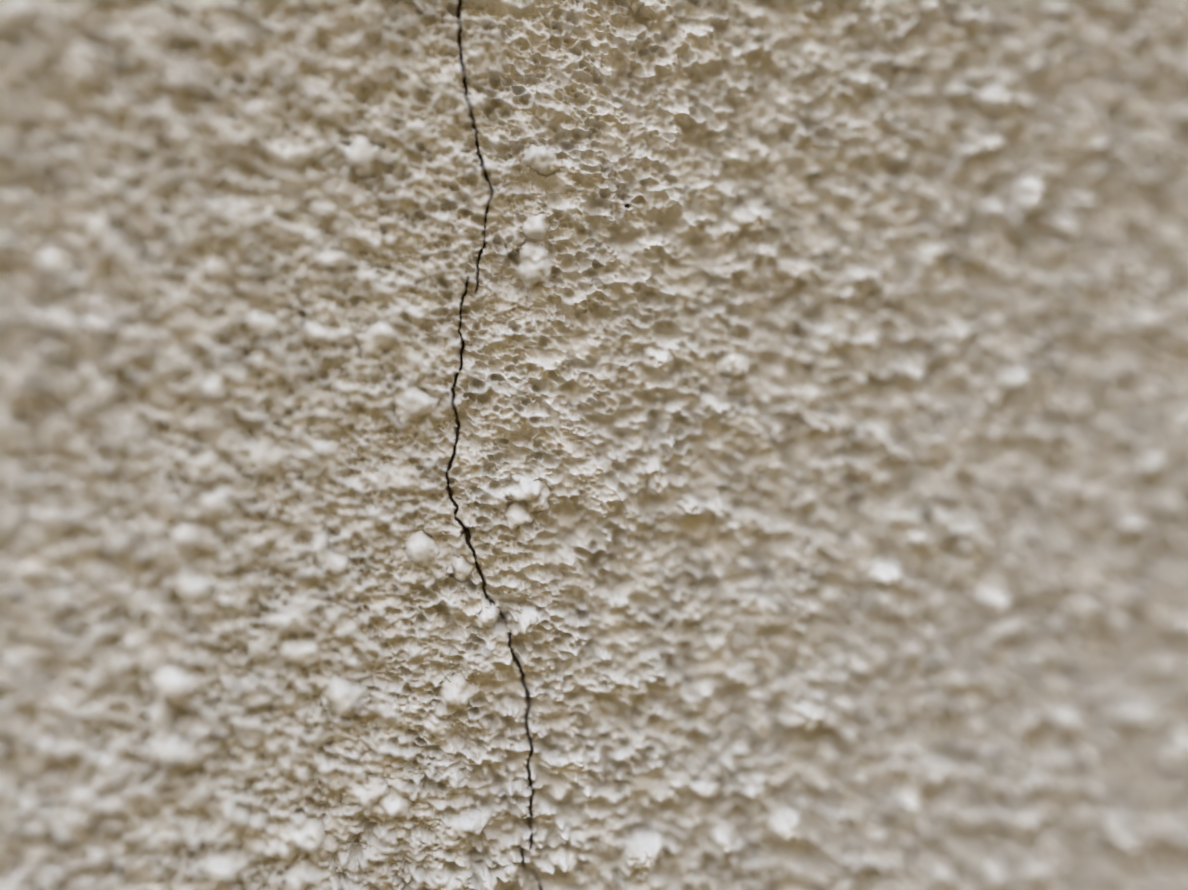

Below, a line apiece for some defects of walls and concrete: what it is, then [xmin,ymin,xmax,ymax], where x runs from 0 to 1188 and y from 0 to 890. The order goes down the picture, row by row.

crack [446,0,543,890]